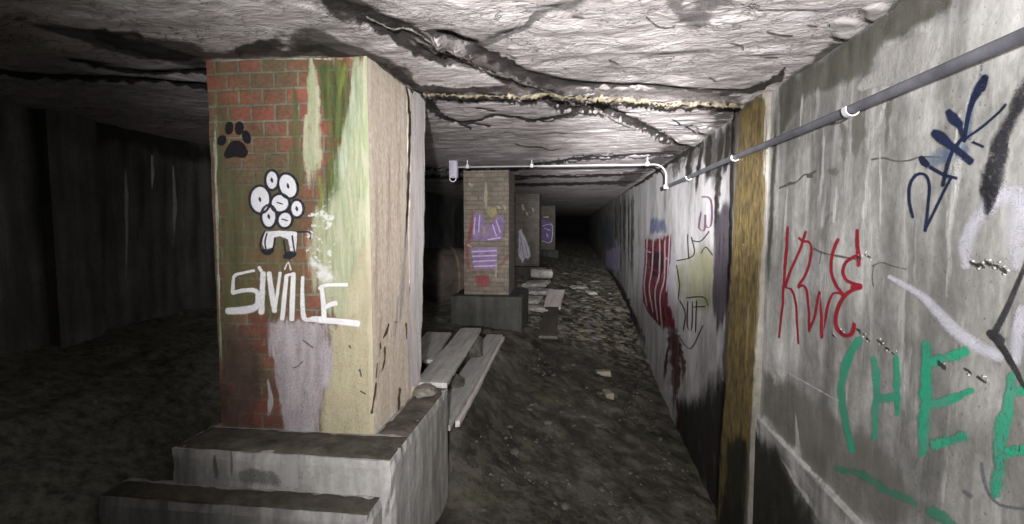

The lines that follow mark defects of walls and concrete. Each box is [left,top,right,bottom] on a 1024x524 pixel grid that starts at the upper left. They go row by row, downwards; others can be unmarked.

peeling [304,56,426,435]
crack [305,0,831,246]
damp [763,0,954,291]
damp [945,62,979,297]
damp [674,358,929,524]